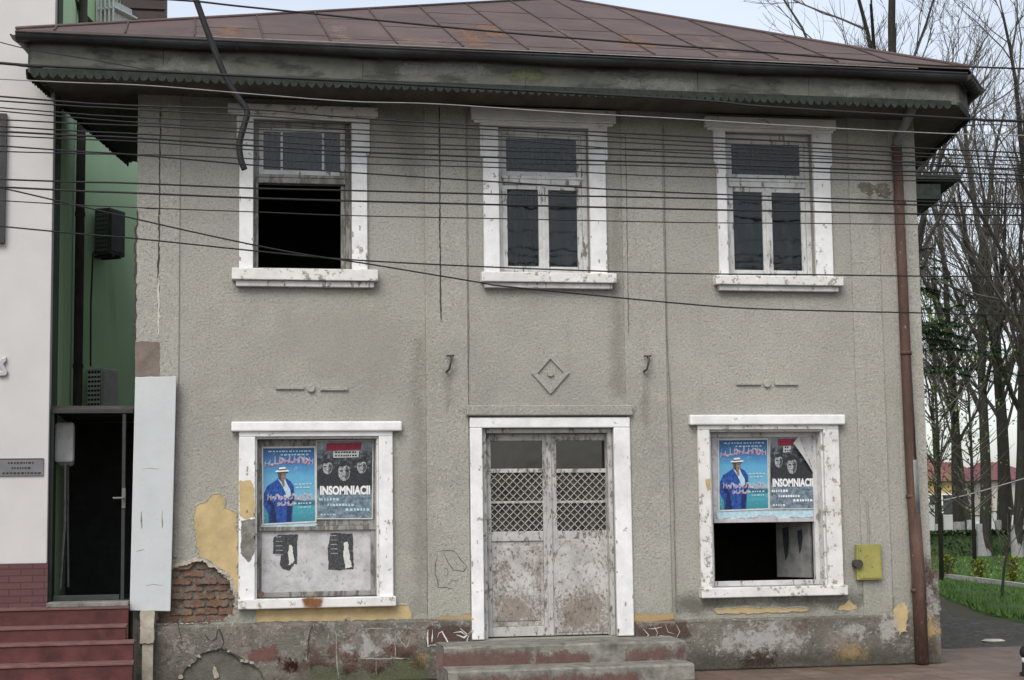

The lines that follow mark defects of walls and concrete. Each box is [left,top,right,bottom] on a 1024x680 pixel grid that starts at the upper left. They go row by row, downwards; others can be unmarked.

spalling [154,461,413,625]
rust [303,597,322,608]
peeling [713,605,811,615]
peeling [836,600,857,612]
peeling [892,602,909,635]
spalling [178,648,264,680]